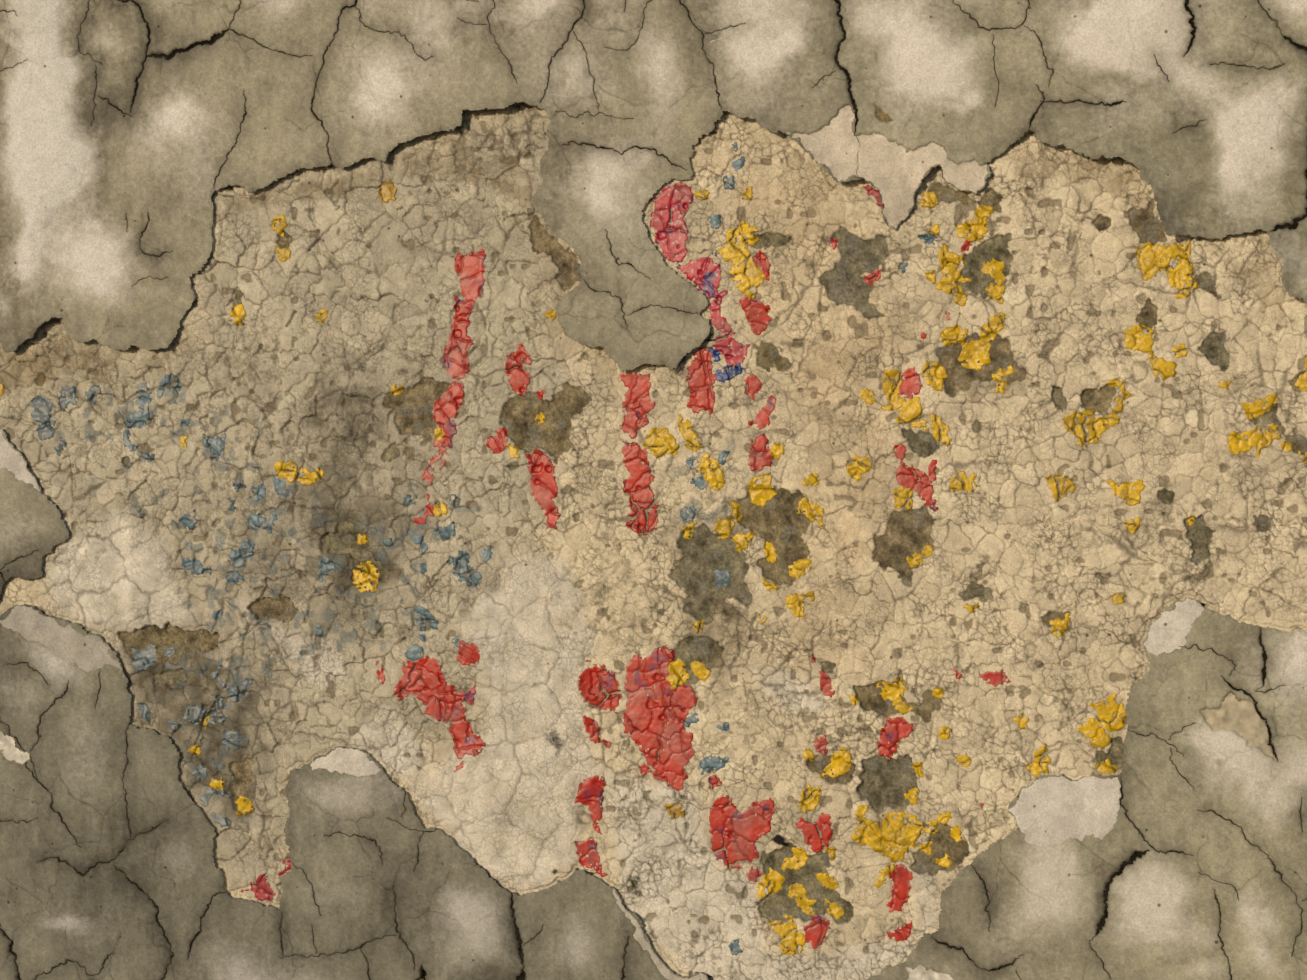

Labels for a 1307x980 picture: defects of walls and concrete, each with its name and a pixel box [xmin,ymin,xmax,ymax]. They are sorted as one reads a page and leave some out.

crack [1154,0,1307,82]
crack [76,0,433,165]
crack [459,0,745,170]
crack [812,0,863,180]
peeling [710,353,727,374]
peeling [958,340,991,370]
peeling [0,732,30,764]
crack [1179,628,1285,762]
spalling [1201,693,1276,760]
peeling [791,917,811,935]
peeling [788,883,817,916]
crack [1089,777,1239,980]